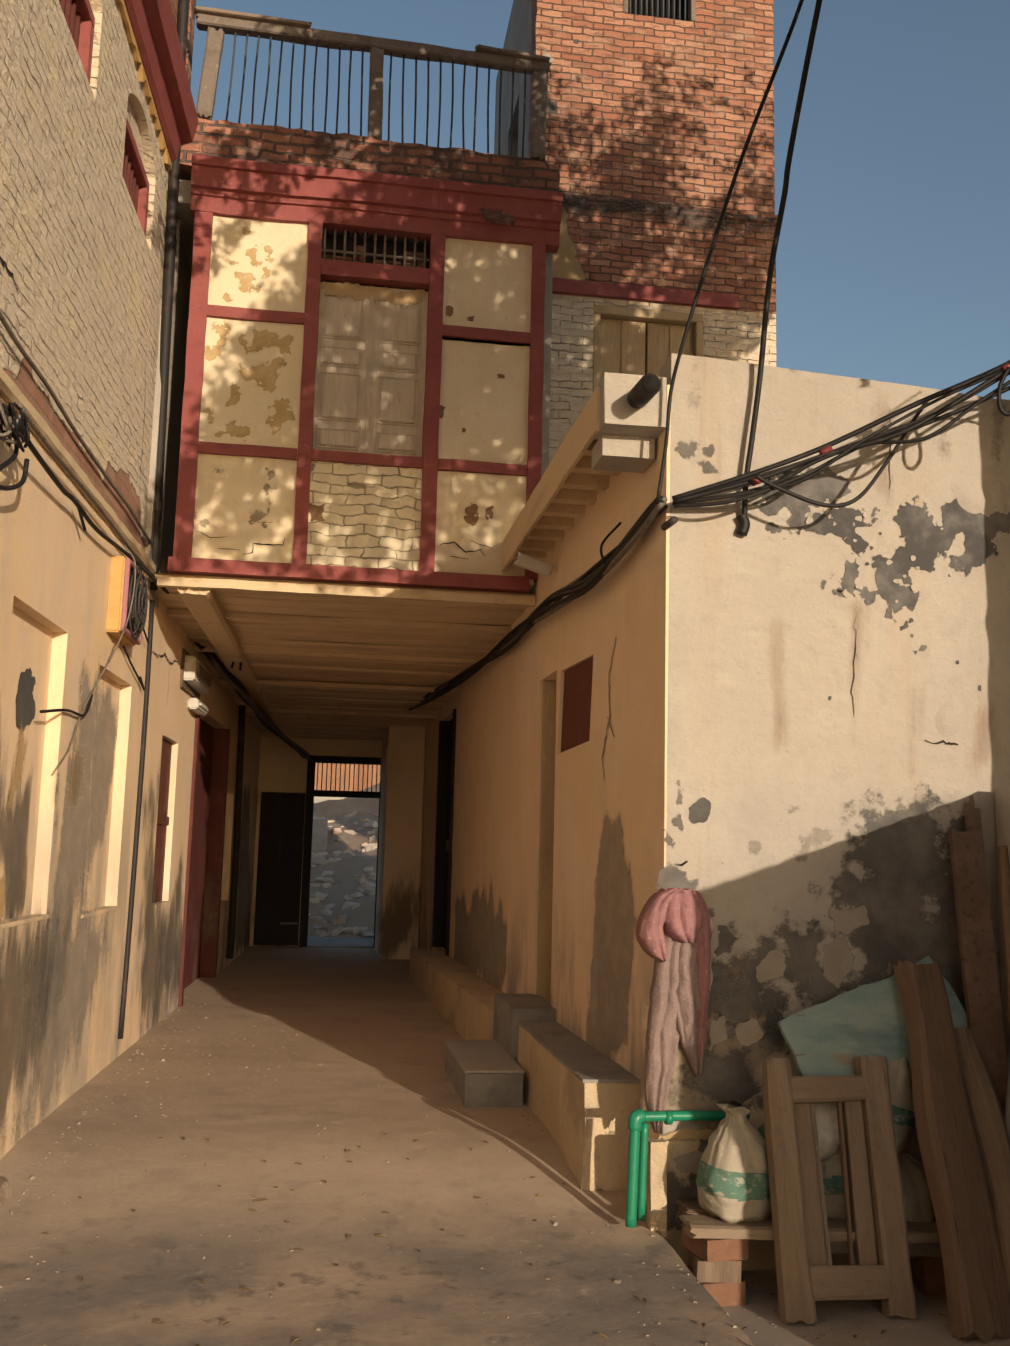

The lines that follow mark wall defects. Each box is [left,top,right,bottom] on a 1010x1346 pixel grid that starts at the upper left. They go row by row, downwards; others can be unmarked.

peeling [219,226,274,302]
peeling [203,321,295,442]
flaking render [3,358,146,551]
spalling [675,441,718,473]
crack [439,540,491,559]
spalling [754,467,1010,654]
crack [850,616,859,709]
spalling [664,780,684,848]
damp [0,670,119,1141]
peeling [756,949,787,983]
peeling [822,905,870,989]
peeling [709,1016,764,1052]